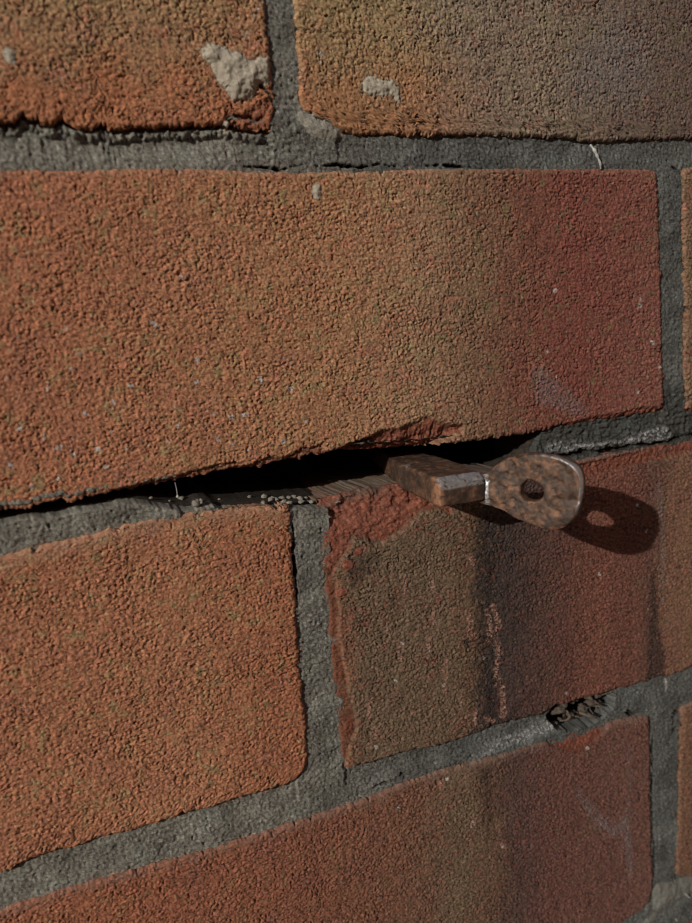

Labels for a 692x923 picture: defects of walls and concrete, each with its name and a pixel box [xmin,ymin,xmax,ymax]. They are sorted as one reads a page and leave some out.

crack [396,431,537,467]
crack [557,433,692,457]
crack [0,448,371,596]